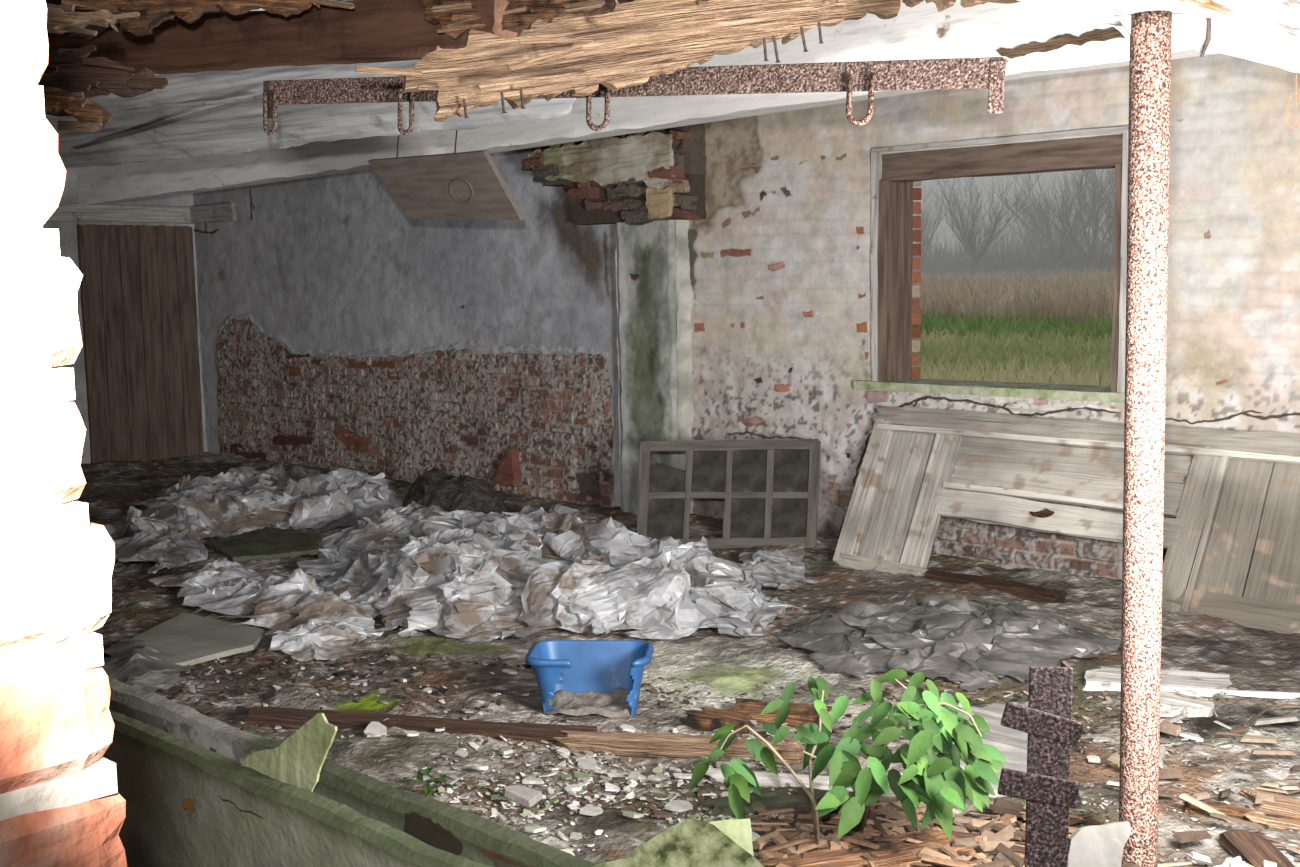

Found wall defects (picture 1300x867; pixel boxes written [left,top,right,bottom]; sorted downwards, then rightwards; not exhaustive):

spalling [521,123,706,225]
flaking render [215,312,615,507]
crack [898,396,1119,416]
crack [838,432,872,539]